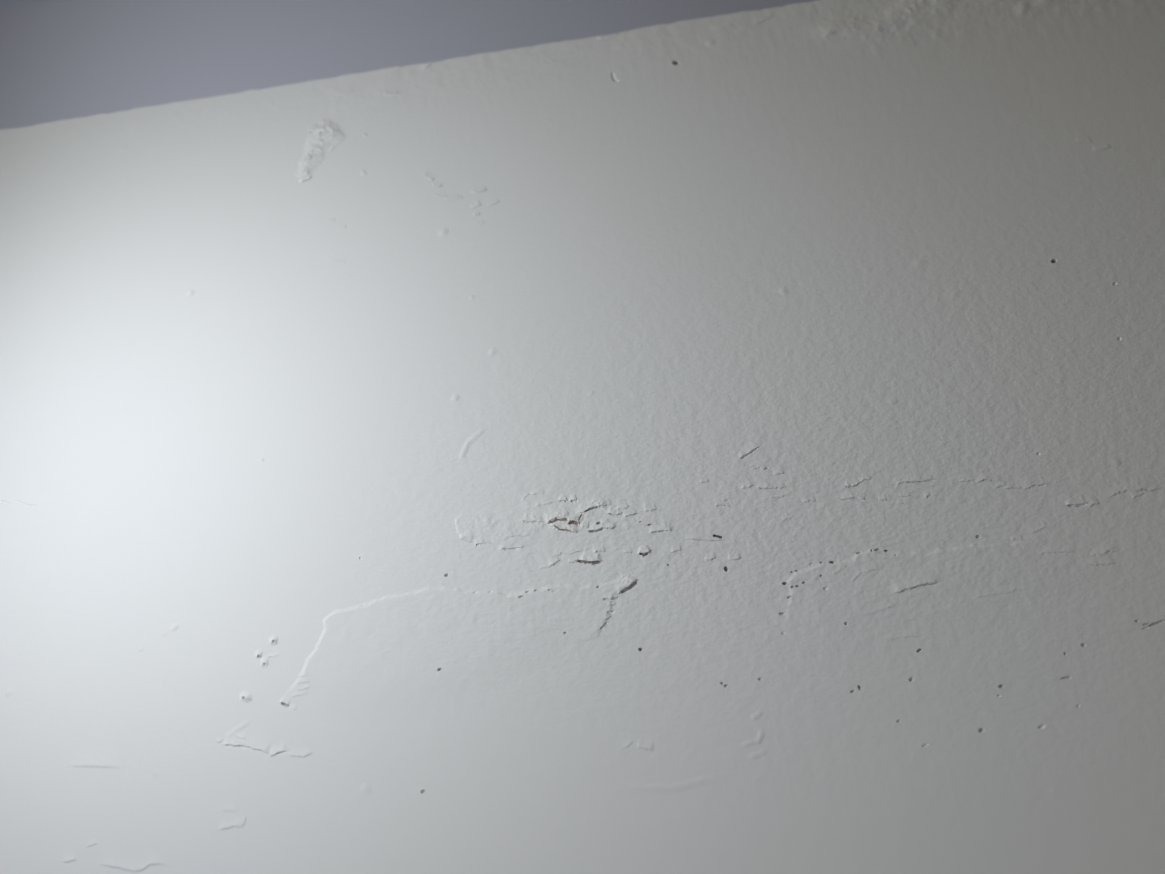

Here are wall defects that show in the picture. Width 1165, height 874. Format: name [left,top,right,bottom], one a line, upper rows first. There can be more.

peeling [454,485,741,573]